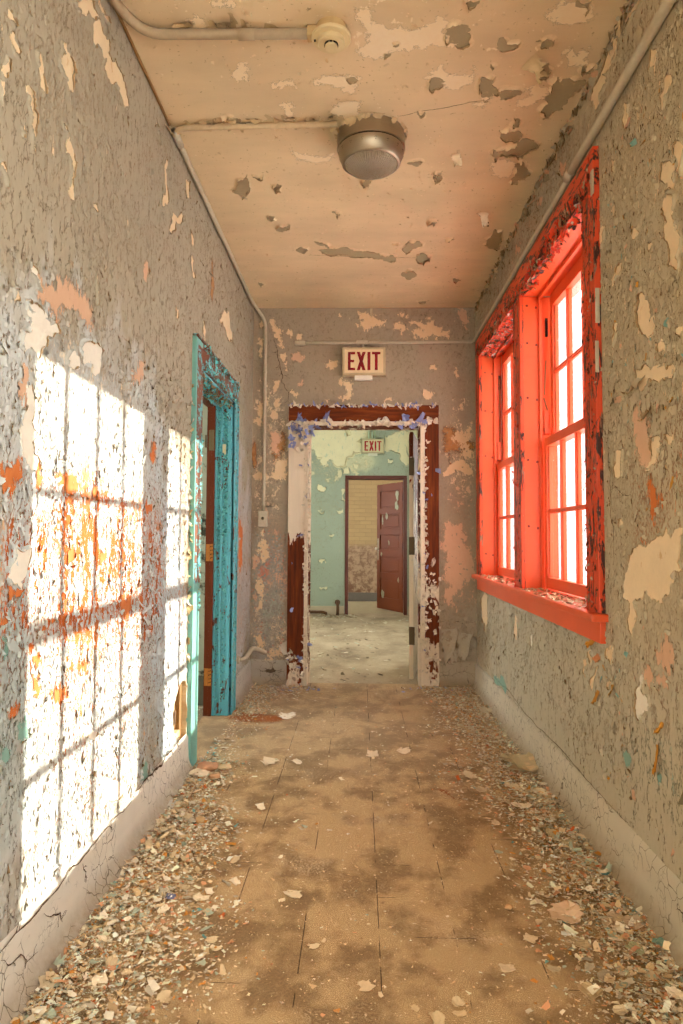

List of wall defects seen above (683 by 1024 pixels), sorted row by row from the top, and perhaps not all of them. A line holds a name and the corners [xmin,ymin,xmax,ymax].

crack [0,736,180,968]
peeling [0,0,312,937]
peeling [183,73,362,133]
peeling [260,0,683,805]